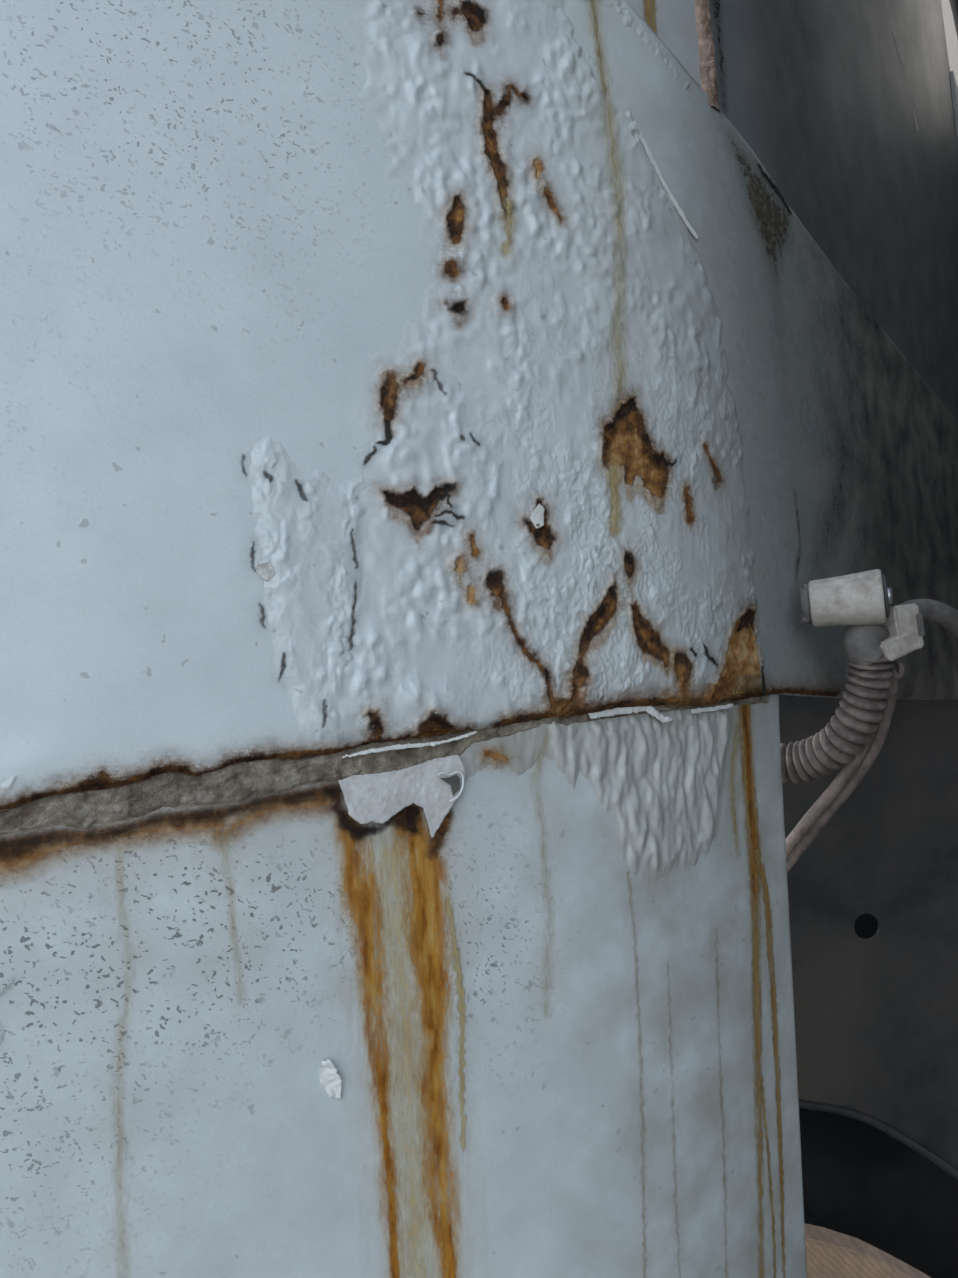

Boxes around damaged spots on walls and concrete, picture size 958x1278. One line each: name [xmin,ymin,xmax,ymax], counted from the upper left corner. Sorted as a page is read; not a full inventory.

rust [465,73,531,254]
rust [442,194,467,282]
rust [364,361,425,465]
rust [381,482,465,537]
rust [602,397,676,535]
rust [0,709,473,812]
peeling [339,731,477,838]
peeling [588,706,674,723]
peeling [691,704,734,714]
rust [491,601,839,1278]
rust [0,783,466,1278]
peeling [320,1059,342,1099]